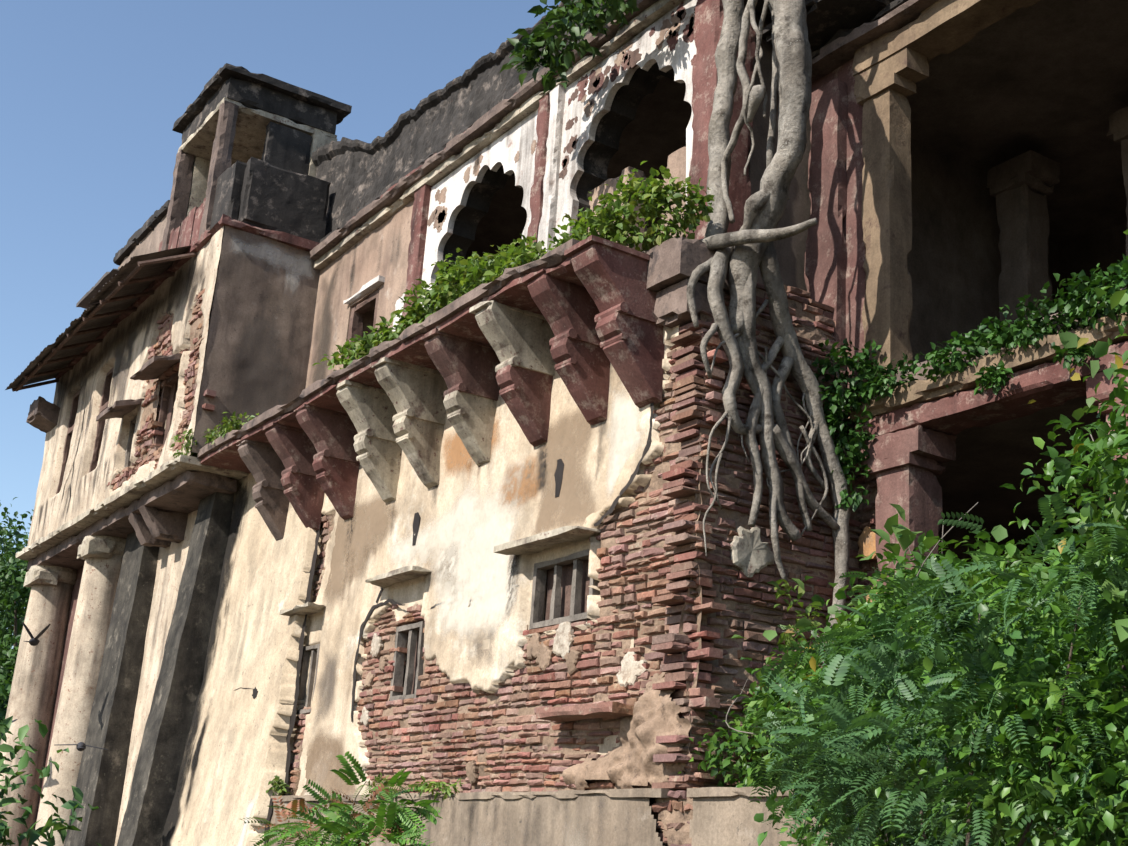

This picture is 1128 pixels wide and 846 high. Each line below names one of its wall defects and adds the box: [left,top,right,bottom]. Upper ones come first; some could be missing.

peeling [649,1,696,65]
peeling [559,42,642,180]
spalling [107,283,217,491]
spalling [356,335,728,846]
flaking render [730,526,775,578]
water stain [179,723,205,801]